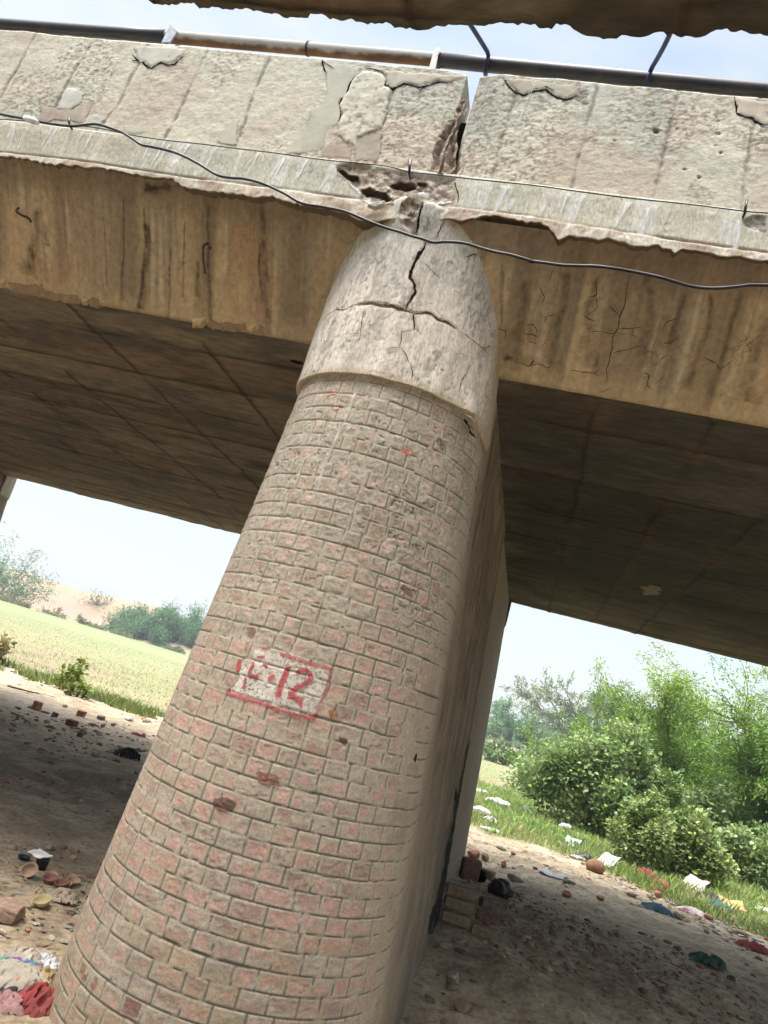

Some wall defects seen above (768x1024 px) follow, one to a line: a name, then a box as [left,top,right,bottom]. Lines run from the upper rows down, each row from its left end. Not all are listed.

peeling [133,45,186,67]
peeling [505,77,589,105]
peeling [38,88,95,123]
peeling [734,98,768,125]
spalling [285,62,468,234]
spalling [743,214,768,235]
crack [325,179,677,390]